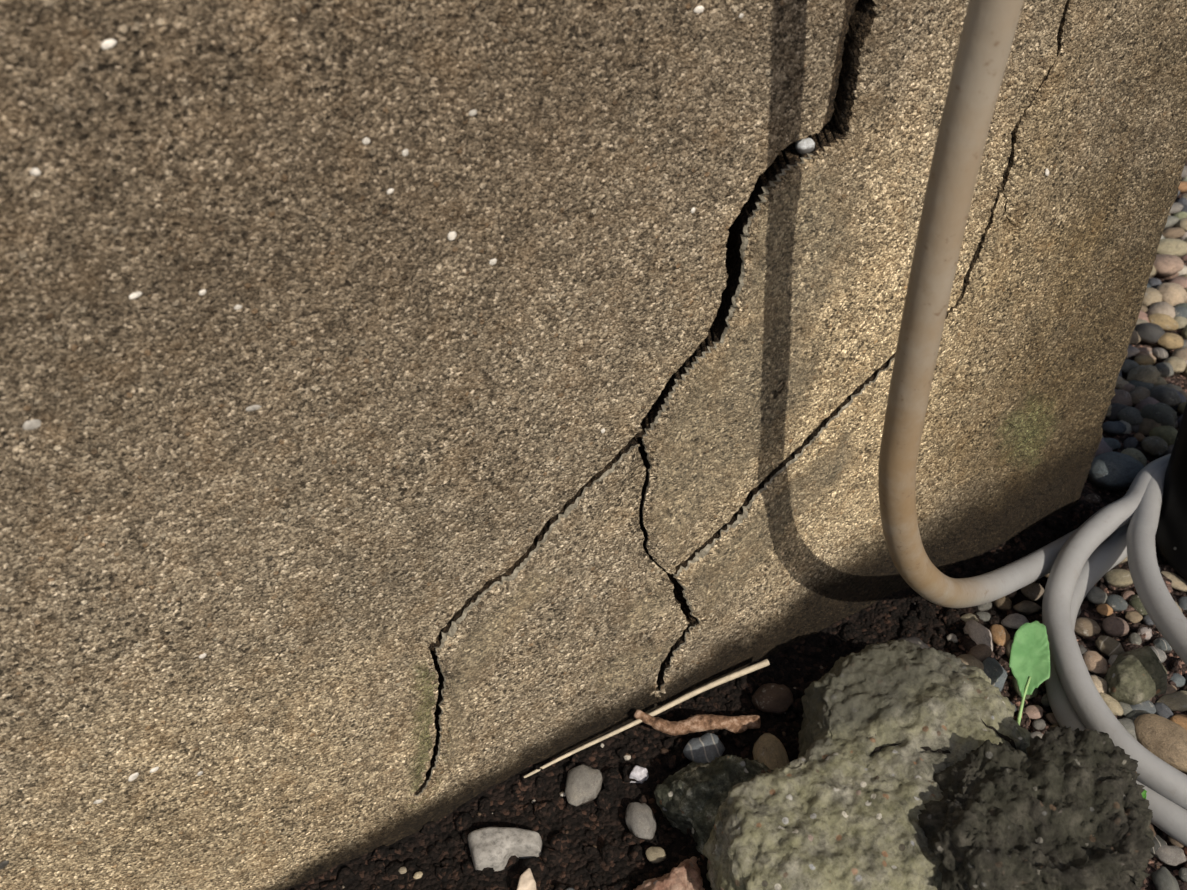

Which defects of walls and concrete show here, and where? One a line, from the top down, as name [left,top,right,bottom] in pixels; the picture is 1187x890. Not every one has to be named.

crack [414,0,896,796]
crack [945,0,1070,319]